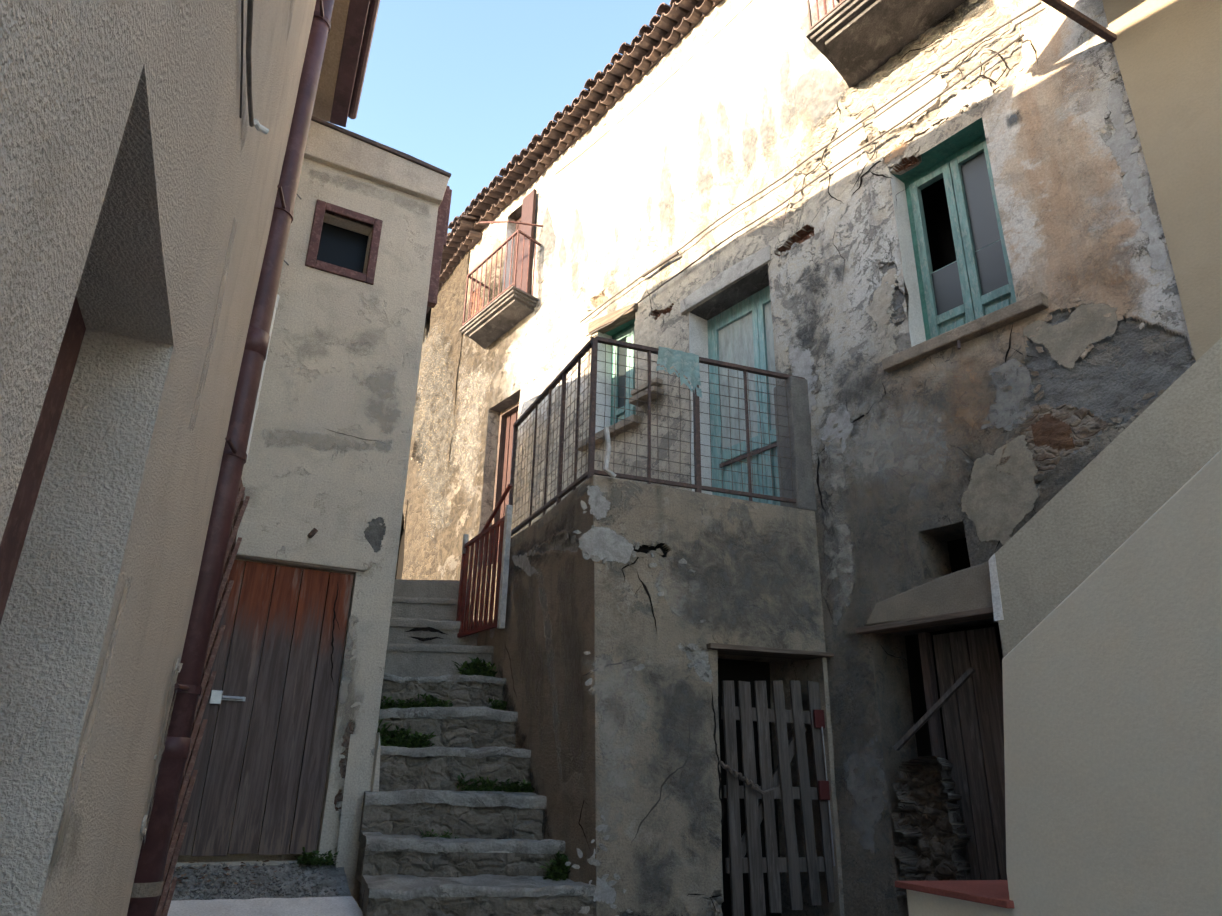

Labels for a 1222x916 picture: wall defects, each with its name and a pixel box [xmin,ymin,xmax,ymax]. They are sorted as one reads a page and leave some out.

damp [645,0,847,282]
flaking render [769,0,1036,266]
flaking render [1102,54,1169,271]
damp [537,207,588,298]
flaking render [784,344,857,454]
flaking render [960,297,1196,545]
flaking render [353,508,393,564]
flaking render [524,485,722,697]
crack [621,546,657,633]
crack [630,694,725,846]
flaking render [669,879,724,916]